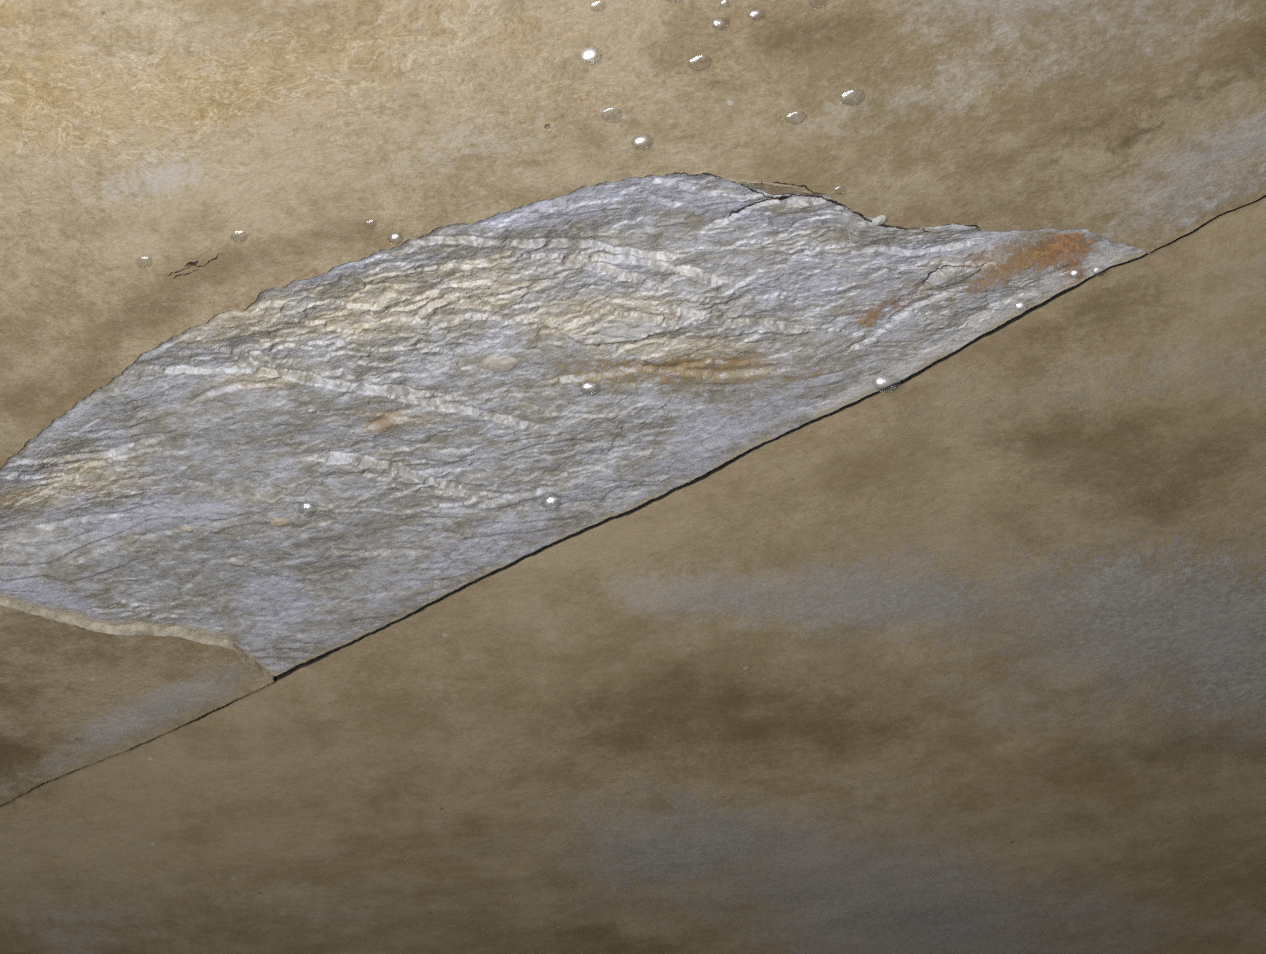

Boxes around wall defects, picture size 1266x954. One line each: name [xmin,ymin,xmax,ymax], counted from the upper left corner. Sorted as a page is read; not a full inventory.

spalling [0,172,1150,680]
corrosion [963,232,1095,292]